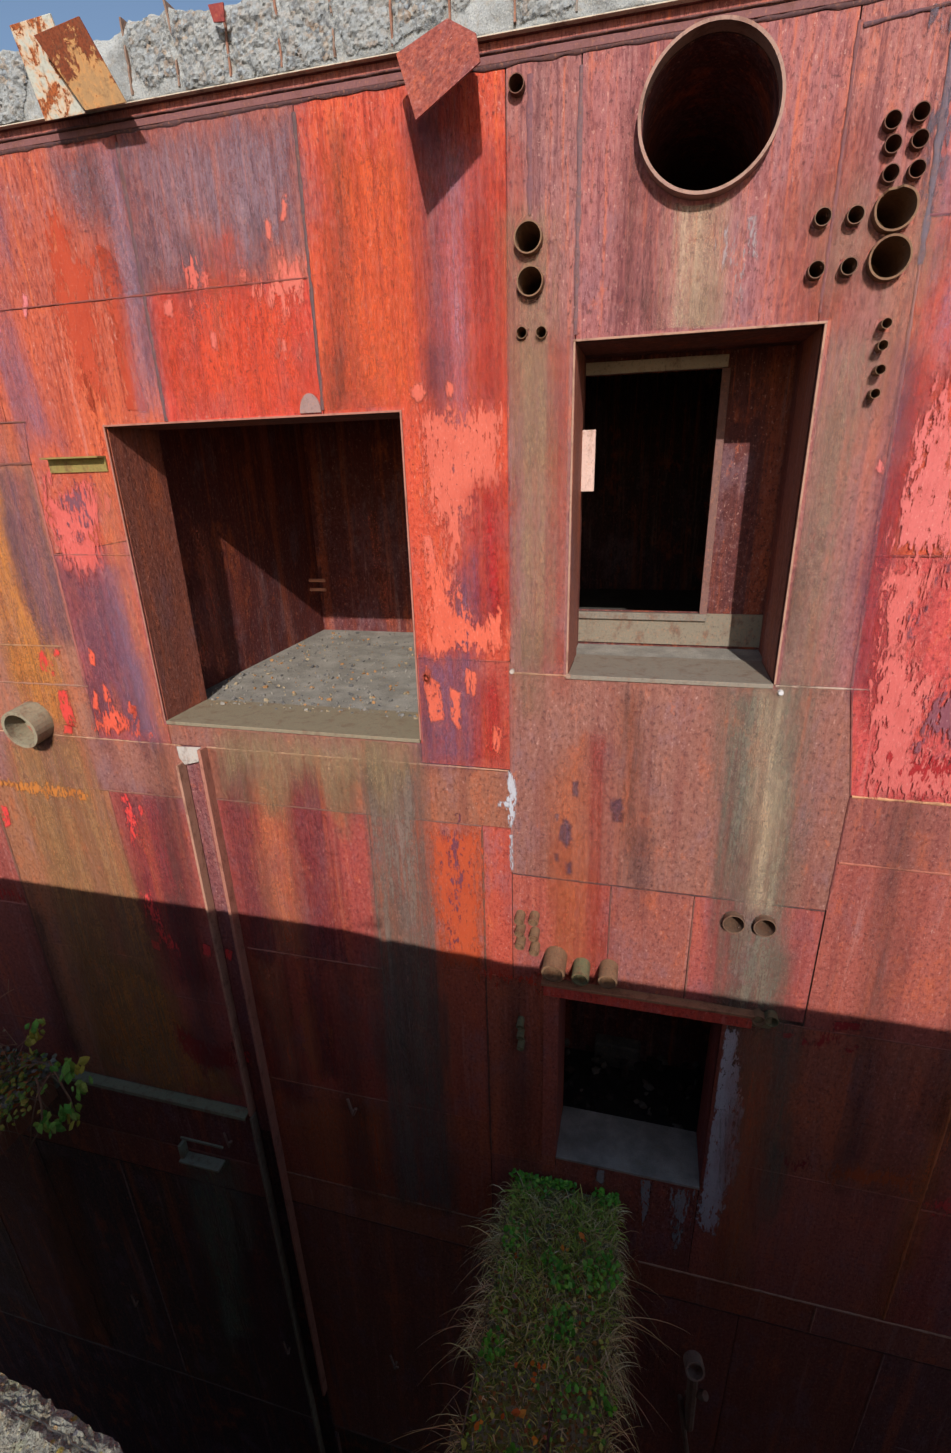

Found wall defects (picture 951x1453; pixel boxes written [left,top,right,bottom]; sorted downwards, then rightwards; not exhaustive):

water stain [676,203,756,328]
water stain [830,216,873,274]
water stain [881,109,950,394]
peeling [41,466,120,588]
peeling [410,381,517,730]
peeling [857,369,951,803]
peeling [39,649,153,737]
rust [426,813,487,994]
peeling [492,725,502,755]
rust [555,814,572,874]
water stain [668,347,868,1250]